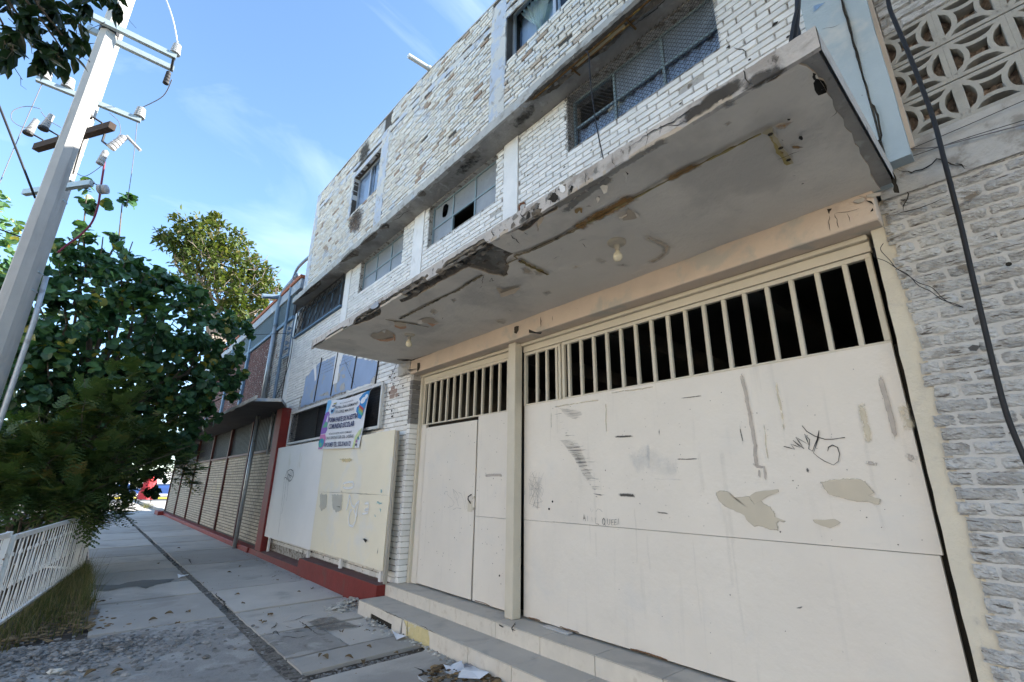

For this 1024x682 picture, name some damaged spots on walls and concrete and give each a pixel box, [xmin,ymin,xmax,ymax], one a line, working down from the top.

corrosion [667,165,697,181]
damp [349,209,361,232]
corrosion [574,196,634,229]
spalling [394,184,573,302]